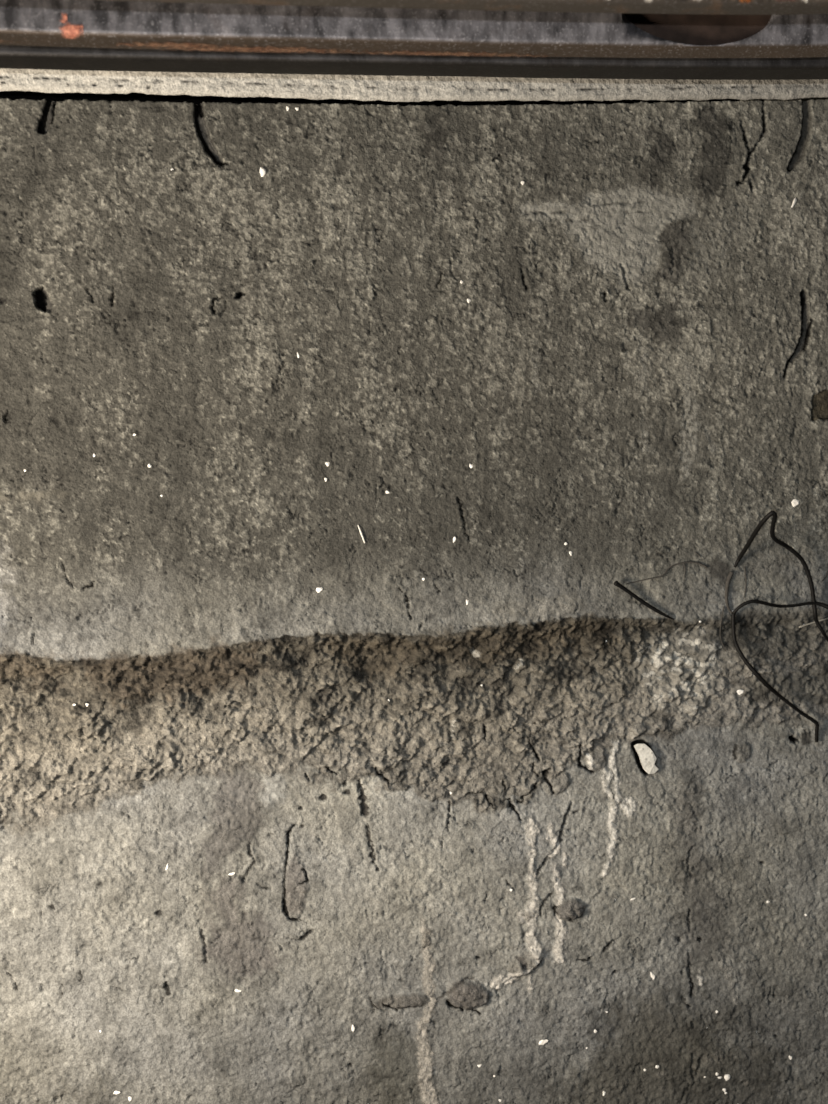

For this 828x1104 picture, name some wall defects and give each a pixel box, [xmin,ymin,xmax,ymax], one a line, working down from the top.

corrosion [61,14,83,39]
crack [0,77,765,191]
damp [586,741,636,877]
damp [491,818,568,990]
damp [368,920,439,1104]